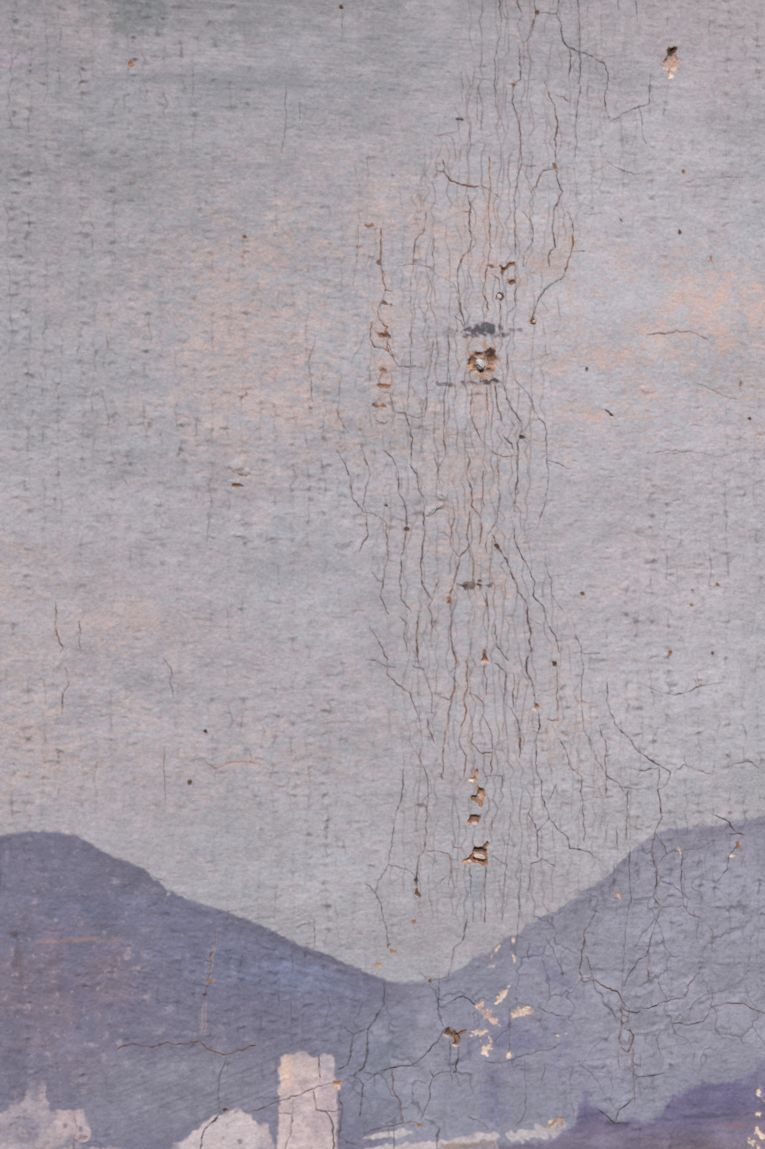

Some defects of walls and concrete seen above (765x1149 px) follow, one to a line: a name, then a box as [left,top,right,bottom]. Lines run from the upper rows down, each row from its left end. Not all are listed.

hole [659,44,683,81]
hole [465,344,499,374]
crack [249,0,765,1149]
hole [459,762,493,869]
crack [115,929,256,1149]
spalling [440,982,540,1062]
peeling [745,1085,765,1149]